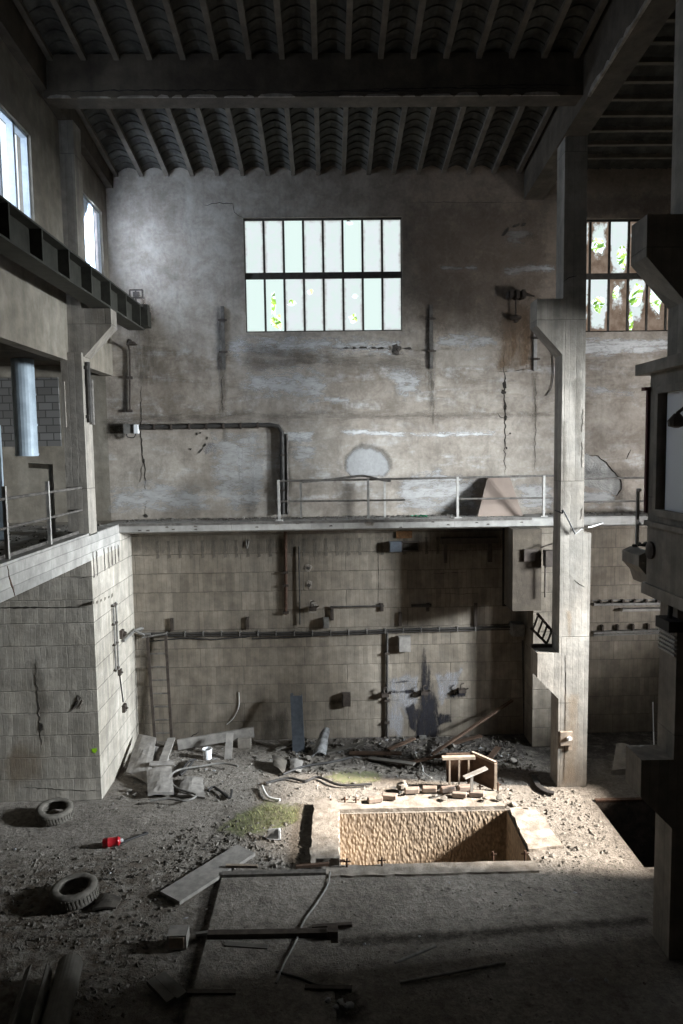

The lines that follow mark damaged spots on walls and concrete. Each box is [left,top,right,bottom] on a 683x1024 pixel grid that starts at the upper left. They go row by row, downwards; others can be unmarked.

crack [140,386,148,518]
crack [498,353,537,470]
crack [34,664,43,740]
damp [406,704,419,733]